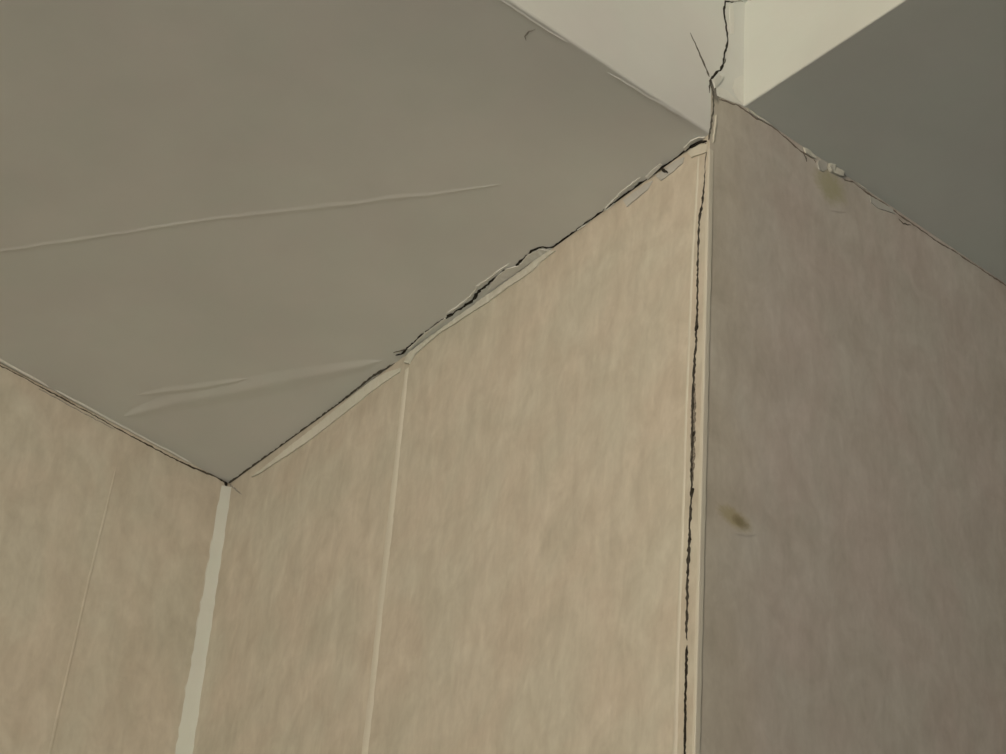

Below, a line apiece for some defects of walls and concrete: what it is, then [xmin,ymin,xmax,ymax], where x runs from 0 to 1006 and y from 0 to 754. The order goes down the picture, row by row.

crack [0,144,693,495]
water stain [710,500,756,537]
crack [683,0,817,754]
crack [843,178,1006,286]